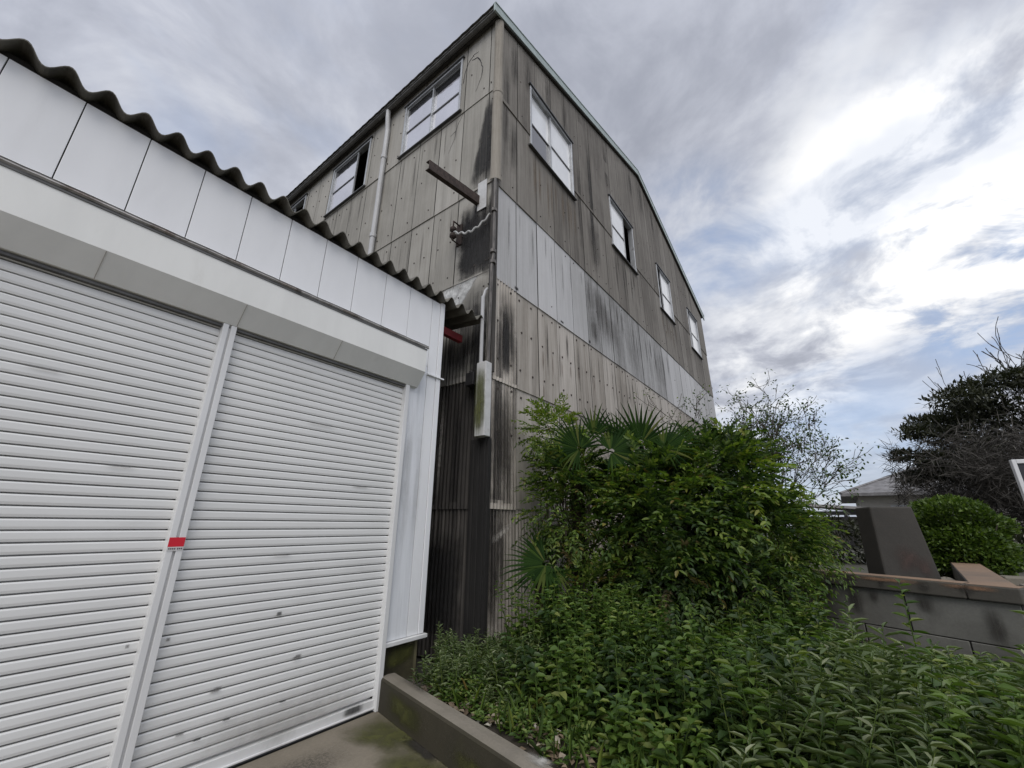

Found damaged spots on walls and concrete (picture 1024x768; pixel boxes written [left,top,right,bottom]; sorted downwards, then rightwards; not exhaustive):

water stain [473,93,516,181]
water stain [441,200,517,610]